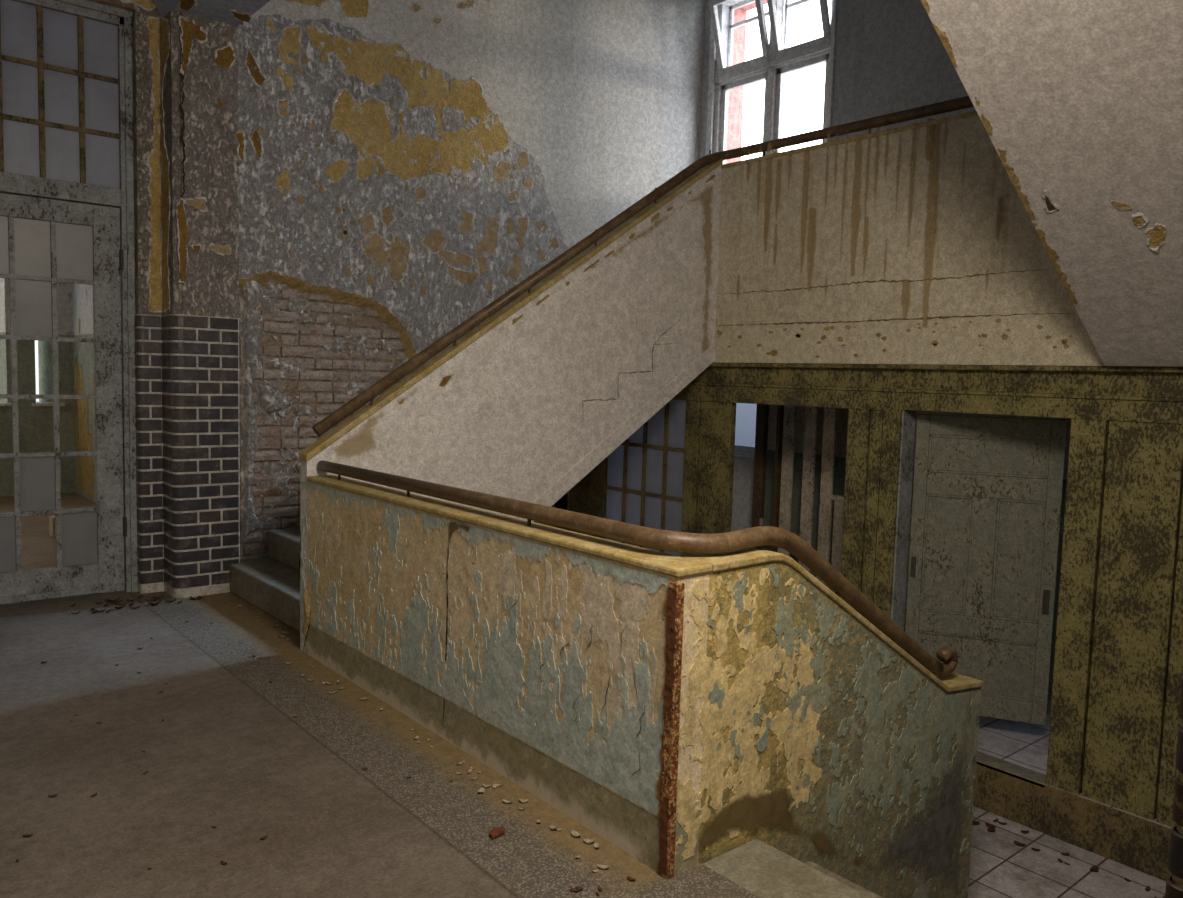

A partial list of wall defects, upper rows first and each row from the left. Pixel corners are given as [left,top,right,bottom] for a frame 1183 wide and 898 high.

crack [179,12,187,199]
leakage [747,143,816,290]
leakage [826,119,947,326]
peeling [119,0,668,816]
crack [557,321,686,446]
crack [443,542,451,664]
corrosion [662,584,676,718]
corrosion [656,734,669,876]
peeling [675,565,981,898]